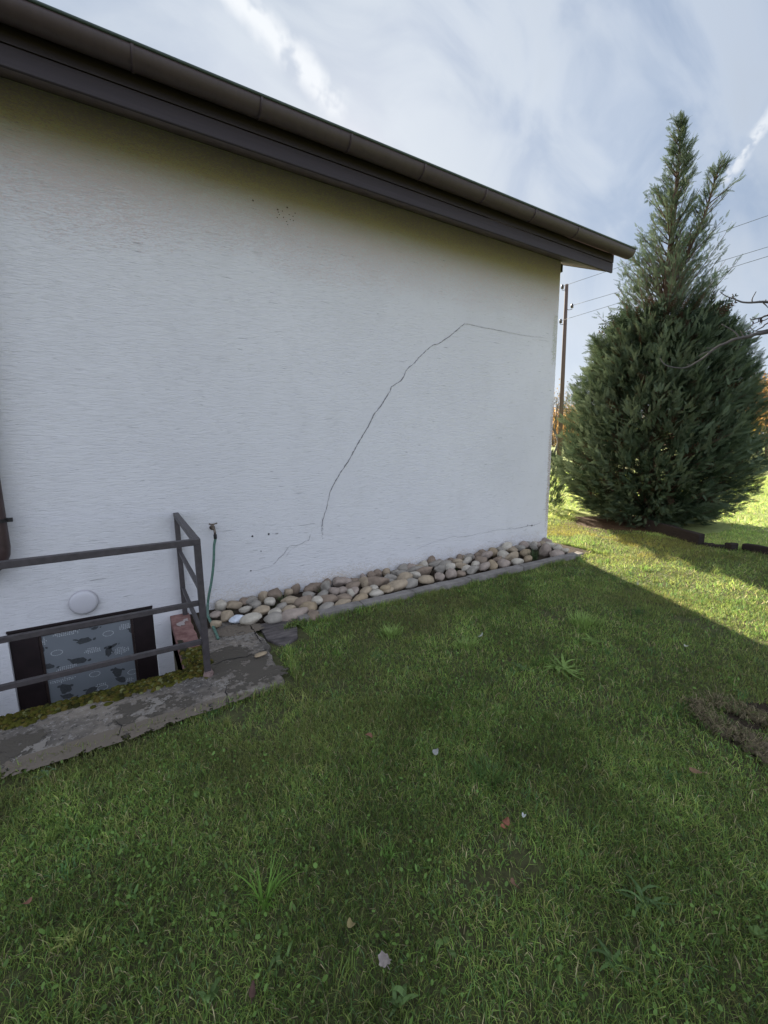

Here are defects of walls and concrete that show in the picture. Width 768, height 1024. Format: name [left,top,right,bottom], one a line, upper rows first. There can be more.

crack [252,323,534,571]